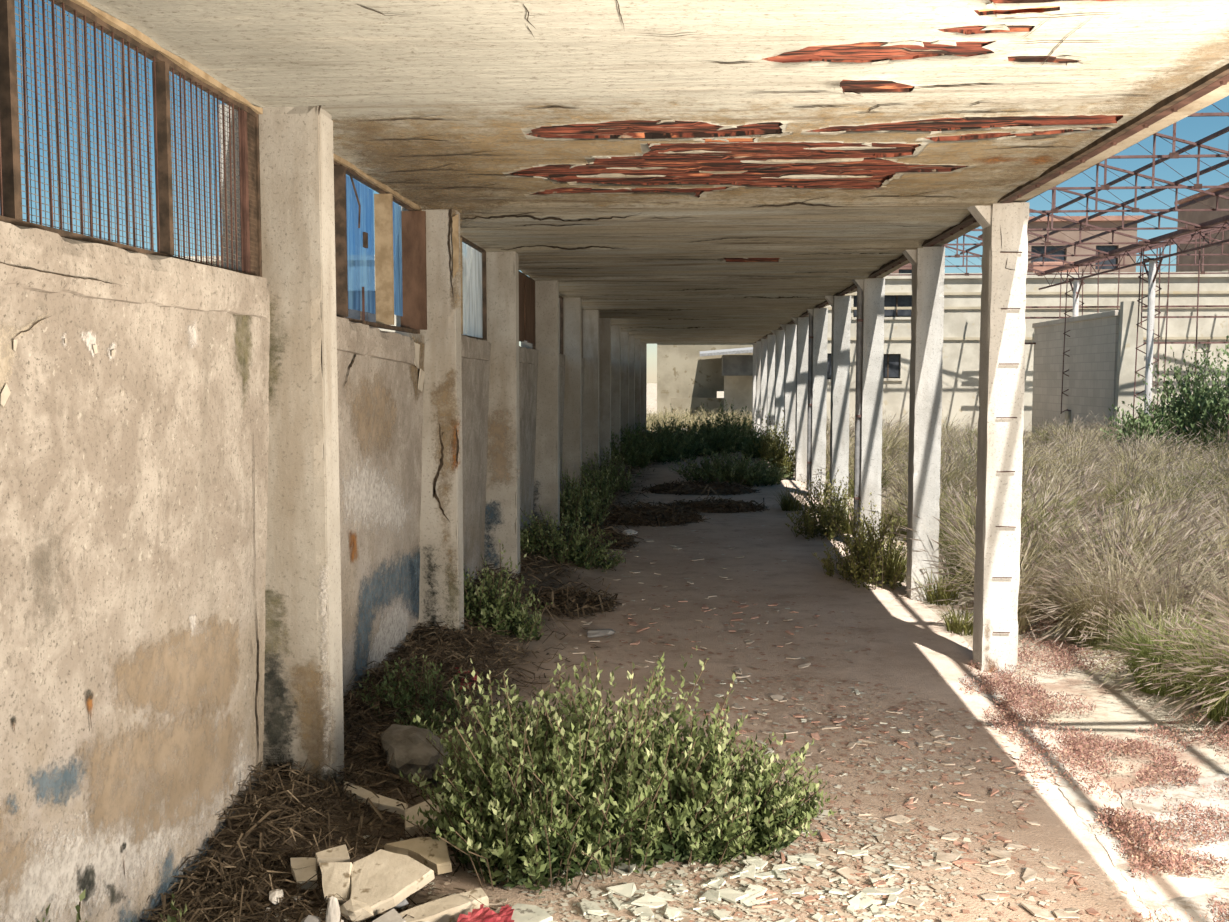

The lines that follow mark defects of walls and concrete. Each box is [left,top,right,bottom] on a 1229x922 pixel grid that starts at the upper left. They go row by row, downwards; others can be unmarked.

spalling [834,80,914,97]
spalling [768,2,1060,64]
spalling [1008,56,1087,67]
spalling [513,115,1123,196]
crack [0,262,119,285]
crack [12,314,50,339]
crack [433,424,450,522]
water stain [0,568,344,922]